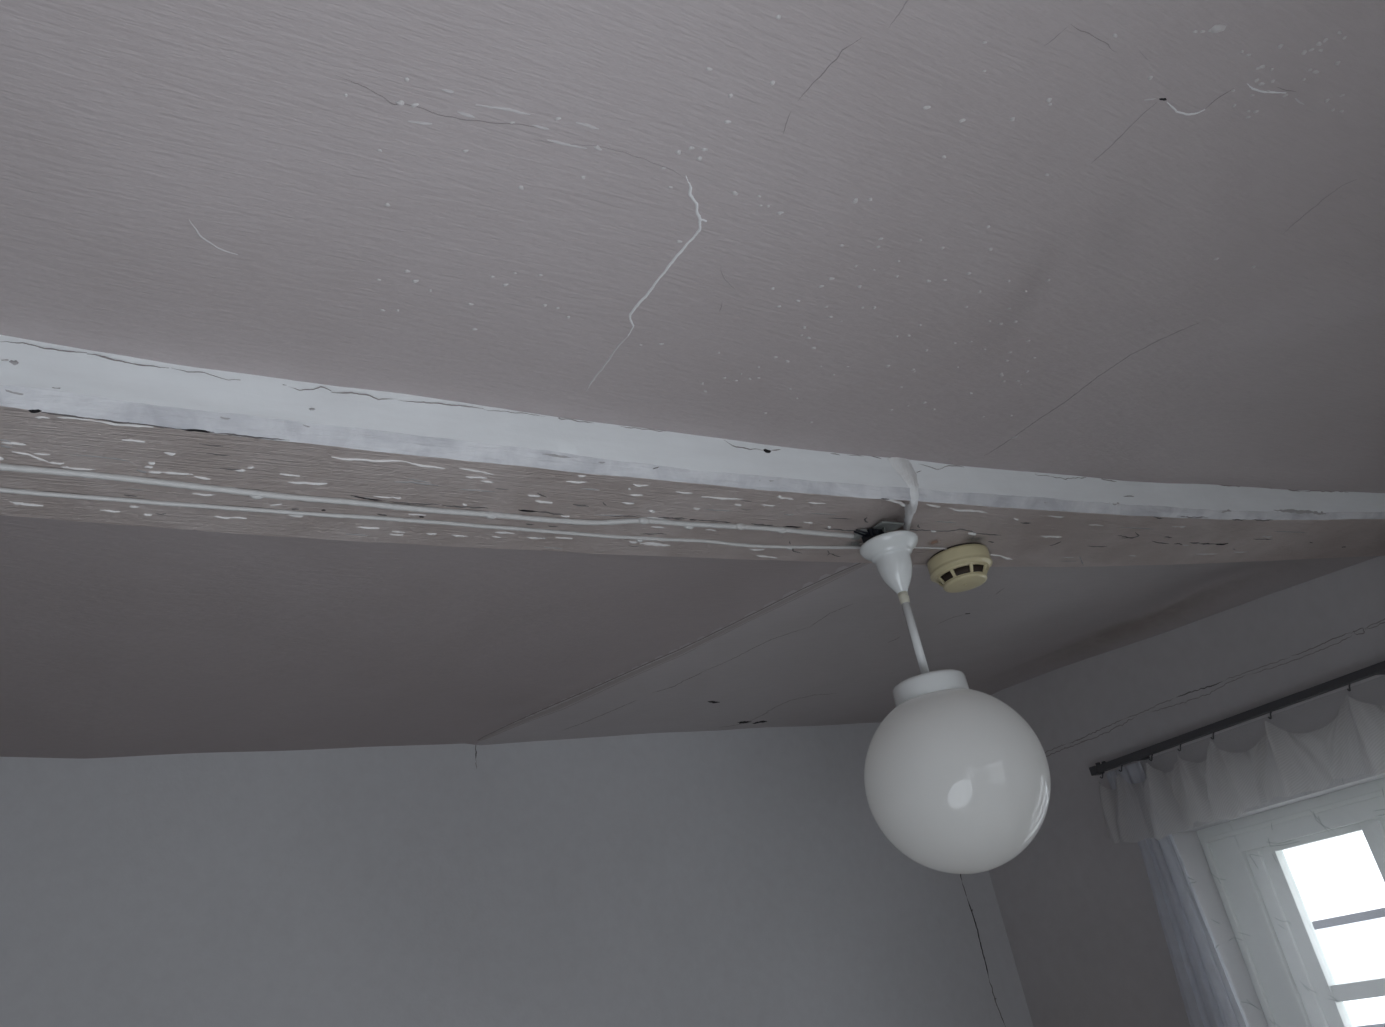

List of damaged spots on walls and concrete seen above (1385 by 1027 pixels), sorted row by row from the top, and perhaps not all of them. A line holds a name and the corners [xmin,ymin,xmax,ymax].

crack [1094,83,1305,161]
crack [283,75,707,432]
crack [4,341,238,380]
peeling [35,416,153,443]
peeling [0,439,254,516]
peeling [280,473,327,485]
peeling [331,456,509,506]
peeling [528,475,670,547]
crack [724,440,781,453]
peeling [678,480,847,529]
crack [1045,619,1385,757]
crack [960,874,1006,1027]